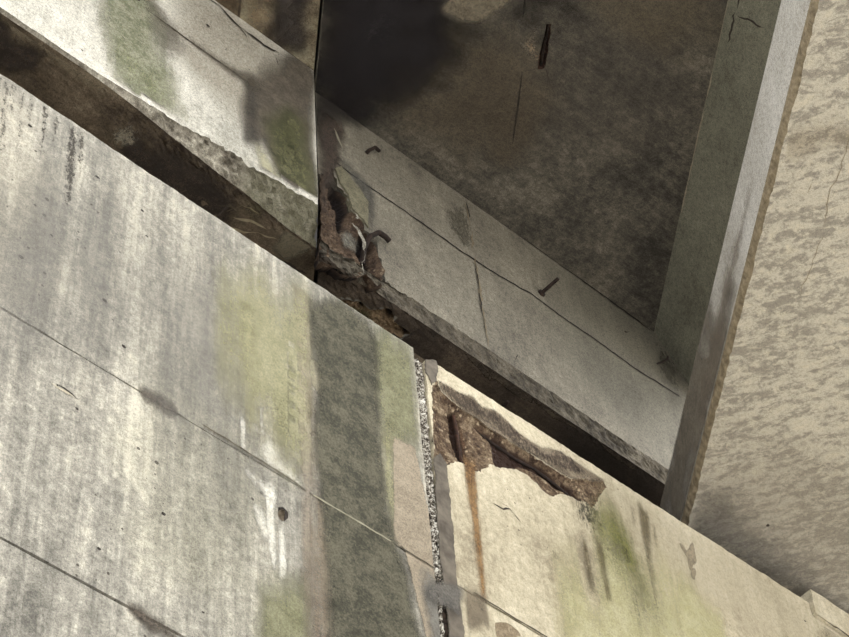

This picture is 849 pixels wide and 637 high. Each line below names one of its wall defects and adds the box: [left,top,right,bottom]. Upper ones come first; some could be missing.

damp [0,20,105,150]
damp [65,127,85,205]
spalling [314,166,392,293]
crack [462,200,489,347]
spalling [465,353,577,429]
spalling [431,381,607,508]
spalling [599,442,635,470]
corrosion [464,460,485,597]
damp [576,492,599,532]
damp [640,507,658,607]
peeling [495,622,523,637]